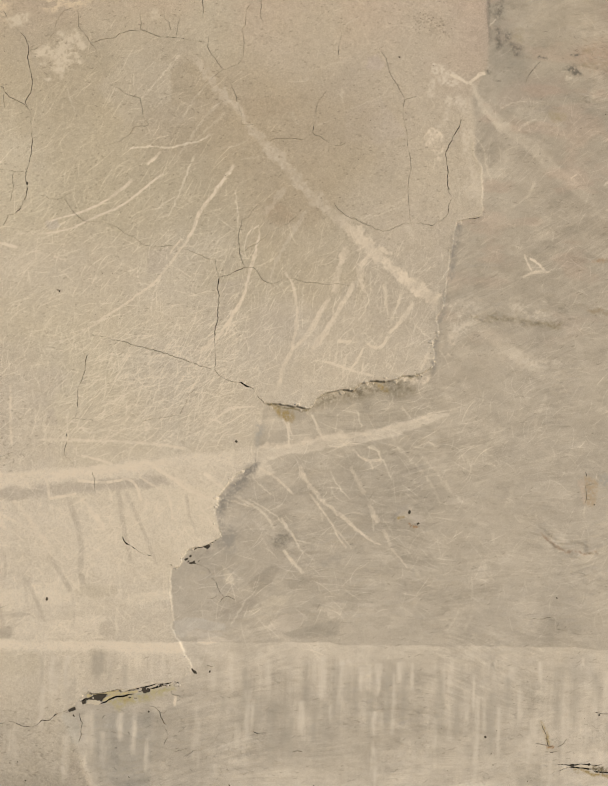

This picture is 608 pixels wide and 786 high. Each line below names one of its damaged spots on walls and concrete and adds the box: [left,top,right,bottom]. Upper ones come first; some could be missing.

crack [3,33,38,108]
crack [1,138,78,224]
crack [95,205,314,400]
flaking render [124,0,608,786]
damp [87,651,143,698]
damp [60,709,165,786]
crack [79,682,195,755]
damp [206,655,416,786]
damp [429,657,608,786]